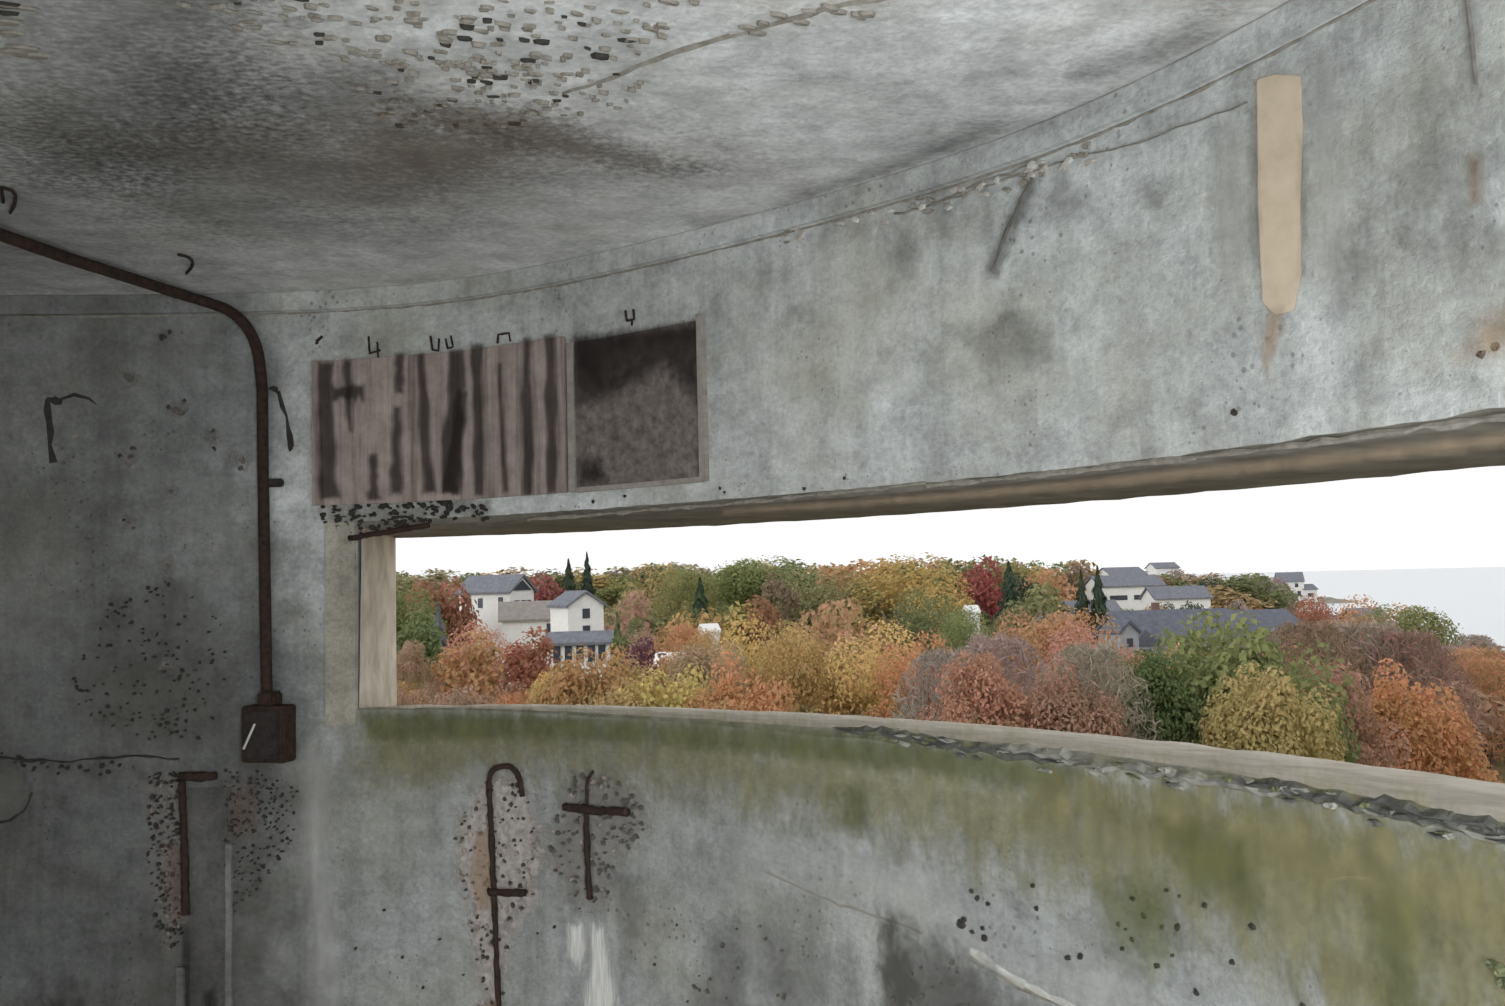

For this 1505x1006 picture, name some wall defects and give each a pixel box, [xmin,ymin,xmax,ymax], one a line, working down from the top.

peeling [209,0,700,129]
spalling [146,769,299,948]
spalling [453,763,645,1006]
water stain [568,921,619,1006]